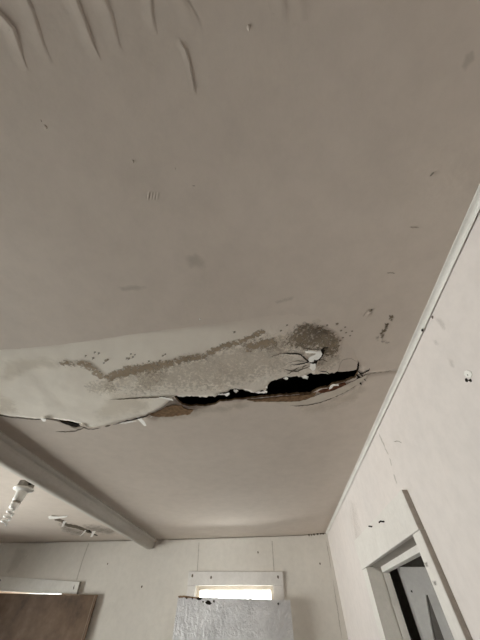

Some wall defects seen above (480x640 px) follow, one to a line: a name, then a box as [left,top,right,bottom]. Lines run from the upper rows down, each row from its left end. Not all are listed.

water stain [59,329,277,382]
spalling [159,347,367,406]
water stain [286,323,353,357]
crack [291,362,390,406]